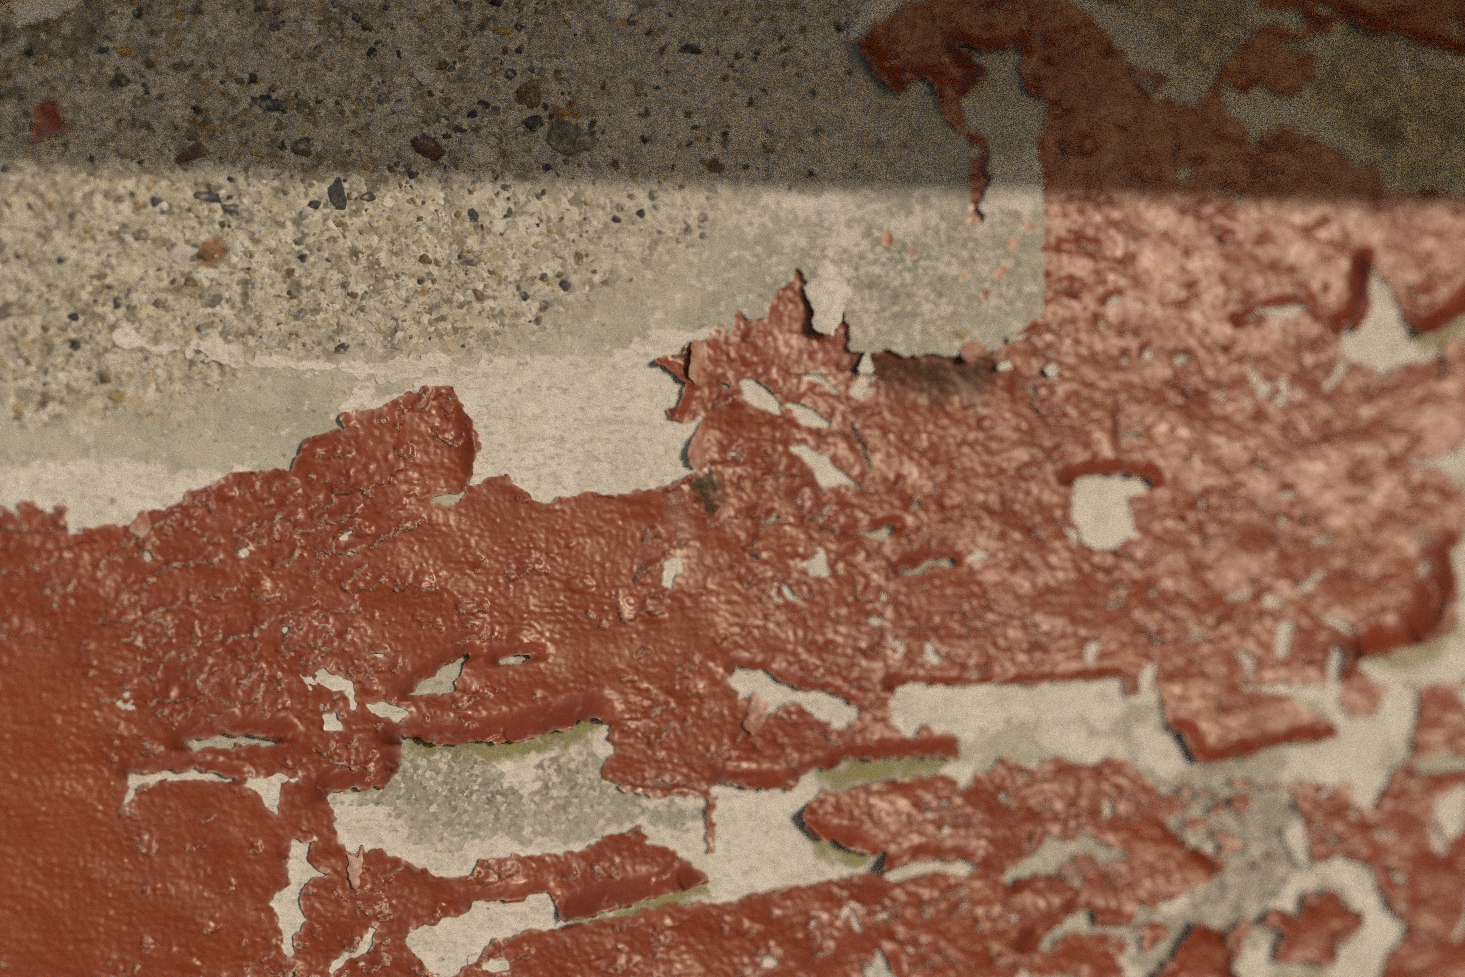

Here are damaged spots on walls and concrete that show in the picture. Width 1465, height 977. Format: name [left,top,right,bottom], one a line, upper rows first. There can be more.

spalling [1068,0,1465,199]
spalling [0,0,1050,562]
peeling [1024,363,1060,394]
peeling [1323,263,1465,391]
peeling [1064,472,1151,550]
peeling [1409,444,1465,488]
peeling [116,691,136,710]
peeling [124,733,300,815]
peeling [300,537,1465,977]
peeling [269,839,326,957]